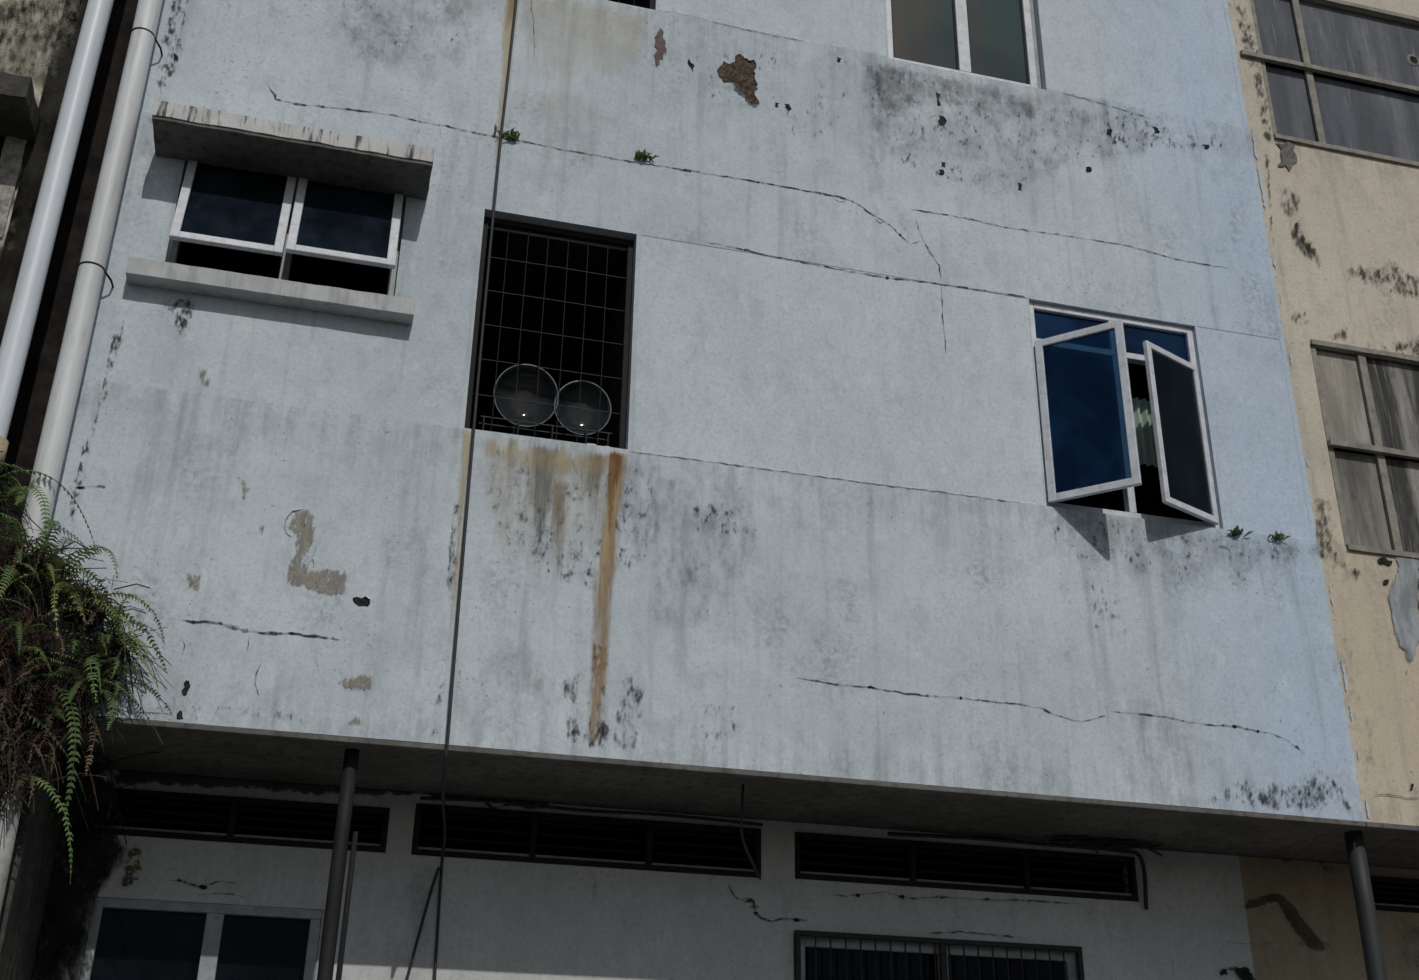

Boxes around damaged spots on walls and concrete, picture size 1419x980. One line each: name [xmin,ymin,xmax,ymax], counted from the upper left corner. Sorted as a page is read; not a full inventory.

spalling [654,28,668,66]
spalling [717,54,791,111]
leakage [0,0,85,340]
crack [267,84,1221,350]
leakage [1349,262,1418,300]
peeling [285,508,370,606]
rust [587,452,625,735]
peeling [1378,557,1419,674]
crack [182,620,338,695]
crack [802,678,1305,755]
leakage [1215,770,1351,809]
leakage [1245,893,1330,950]